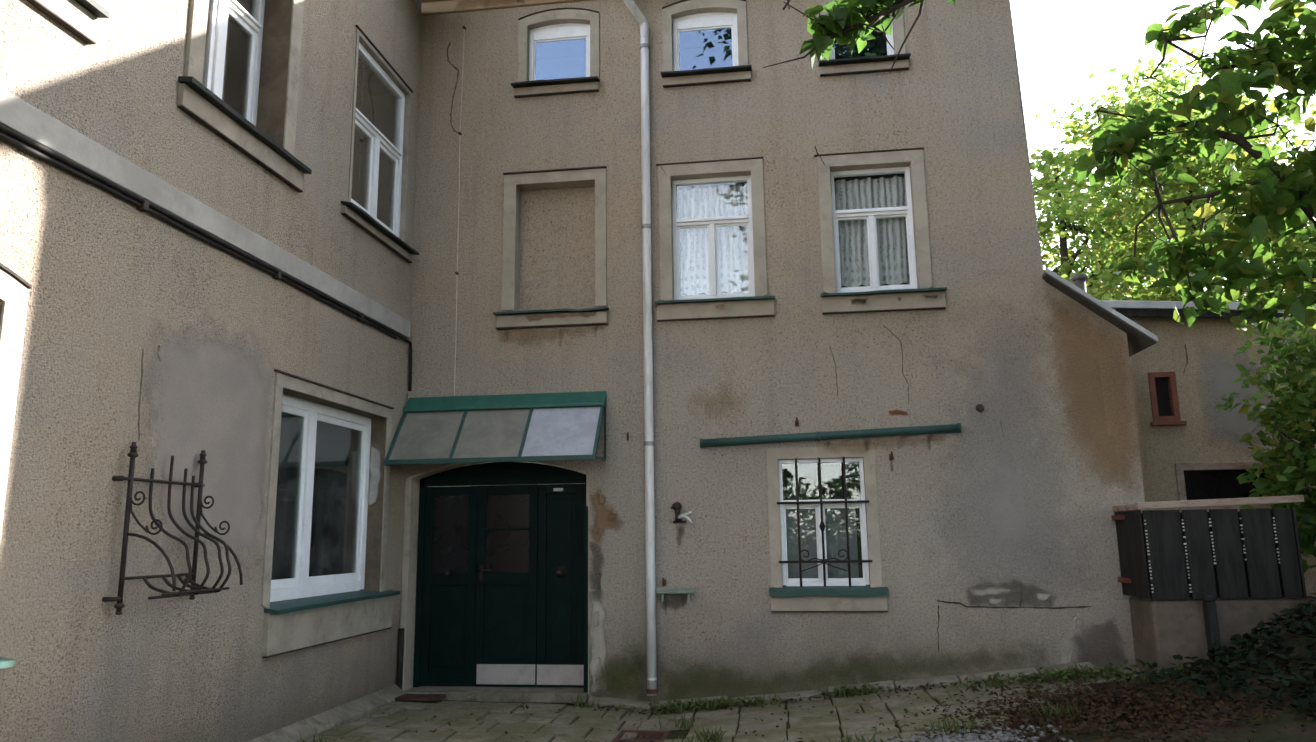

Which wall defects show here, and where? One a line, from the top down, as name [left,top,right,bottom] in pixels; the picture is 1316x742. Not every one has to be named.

crack [883,325,909,403]
flaking render [592,491,621,542]
damp [591,545,603,598]
flaking render [969,582,1051,605]